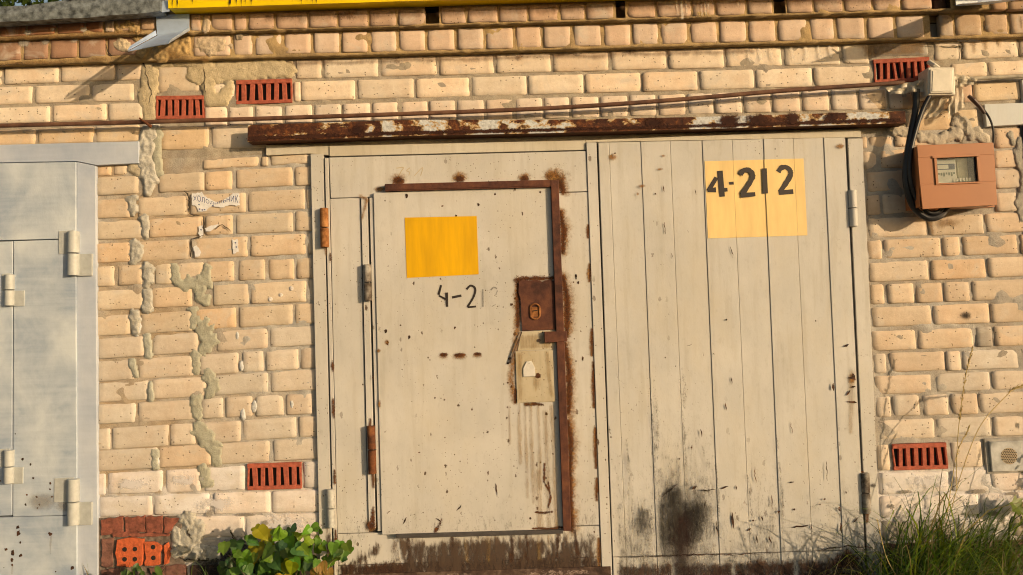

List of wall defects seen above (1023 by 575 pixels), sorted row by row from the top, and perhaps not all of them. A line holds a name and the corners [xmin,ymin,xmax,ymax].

rust [248,112,901,141]
rust [545,170,568,195]
rust [560,209,569,255]
rust [327,264,601,574]
peeling [198,497,304,533]
water stain [619,433,720,575]